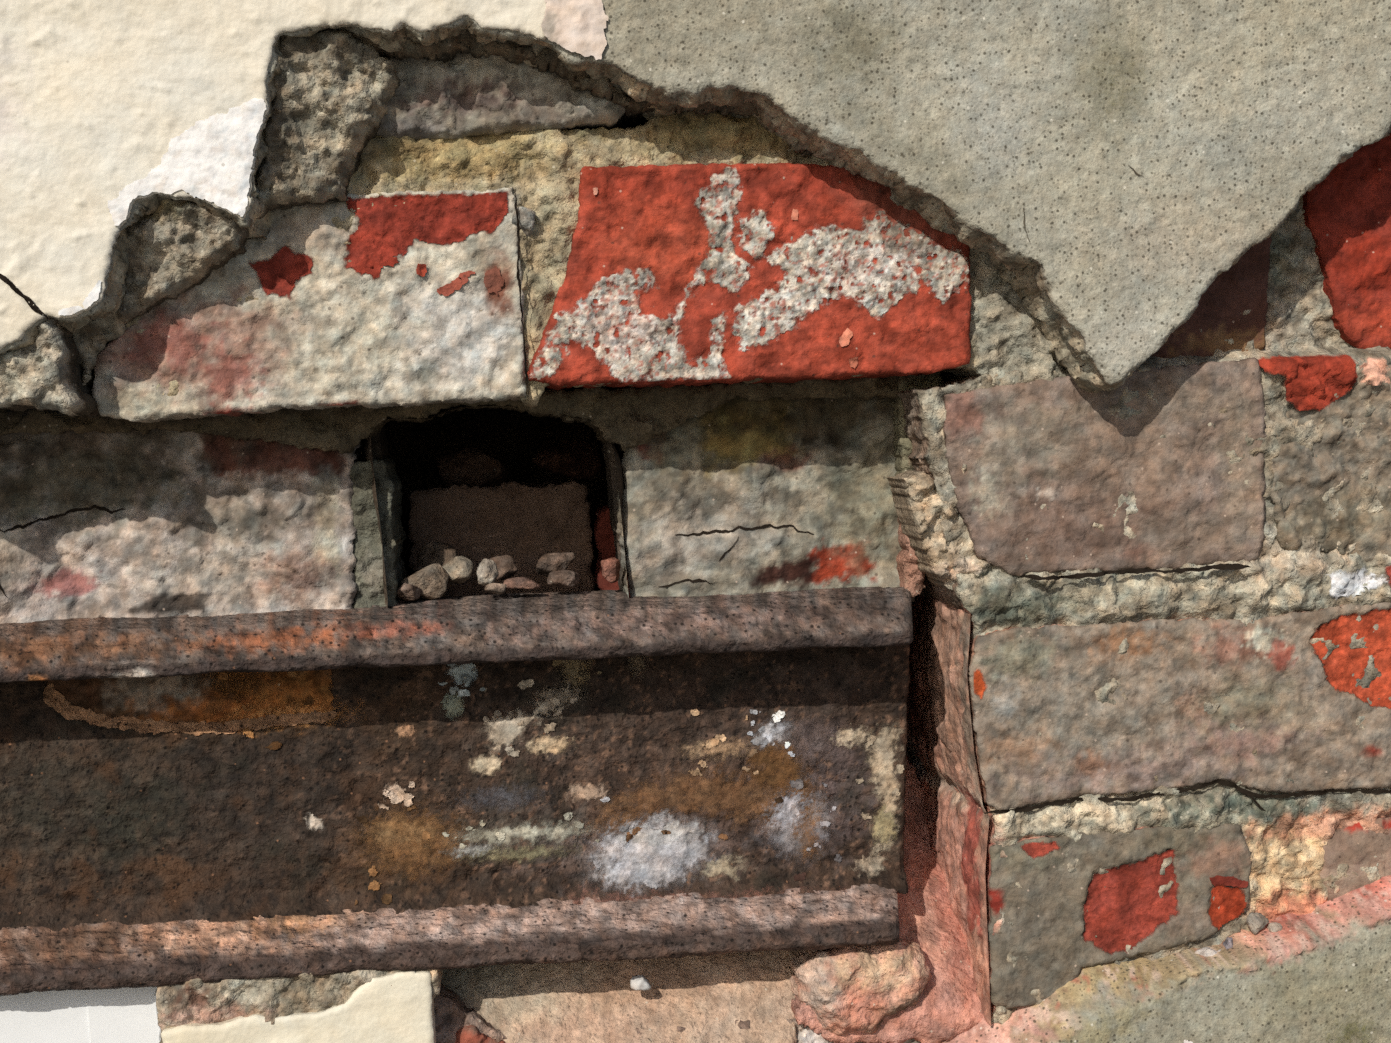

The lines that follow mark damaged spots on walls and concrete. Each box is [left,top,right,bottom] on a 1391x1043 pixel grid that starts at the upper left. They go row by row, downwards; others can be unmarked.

spalling [0,0,759,418]
crack [0,273,50,320]
peeling [531,167,969,382]
spalling [1259,354,1358,411]
spalling [363,405,631,608]
spalling [1310,608,1391,709]
peeling [43,684,337,736]
rust [214,672,339,750]
rust [594,740,825,852]
rust [355,805,468,905]
spalling [1083,849,1179,954]
spalling [1208,875,1248,930]